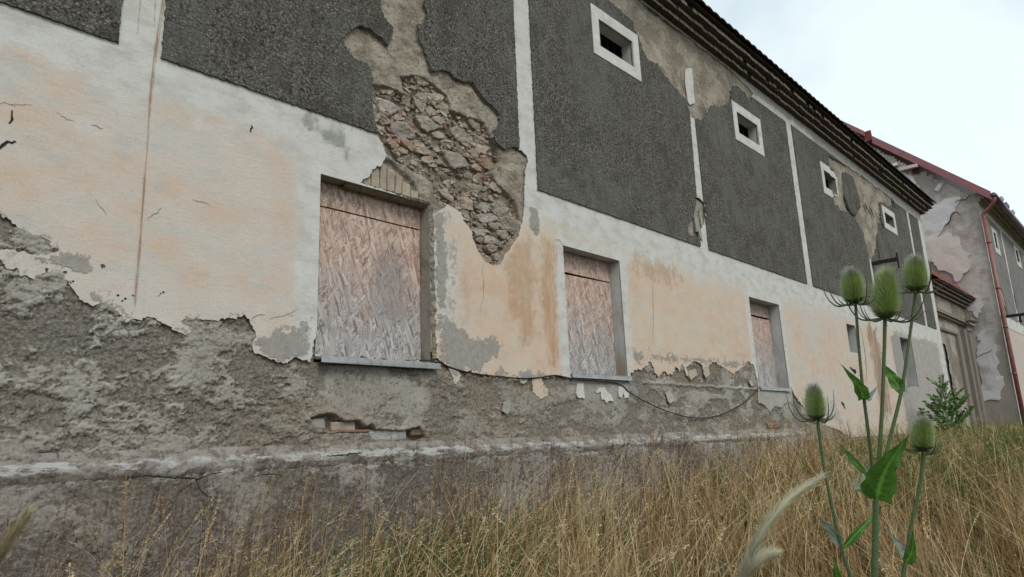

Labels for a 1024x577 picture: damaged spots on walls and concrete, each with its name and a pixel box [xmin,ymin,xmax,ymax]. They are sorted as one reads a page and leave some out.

peeling [0,0,847,461]
water stain [529,207,540,235]
spalling [829,158,891,259]
peeling [920,183,971,282]
water stain [434,212,562,383]
peeling [967,294,1005,402]
crack [127,472,222,498]